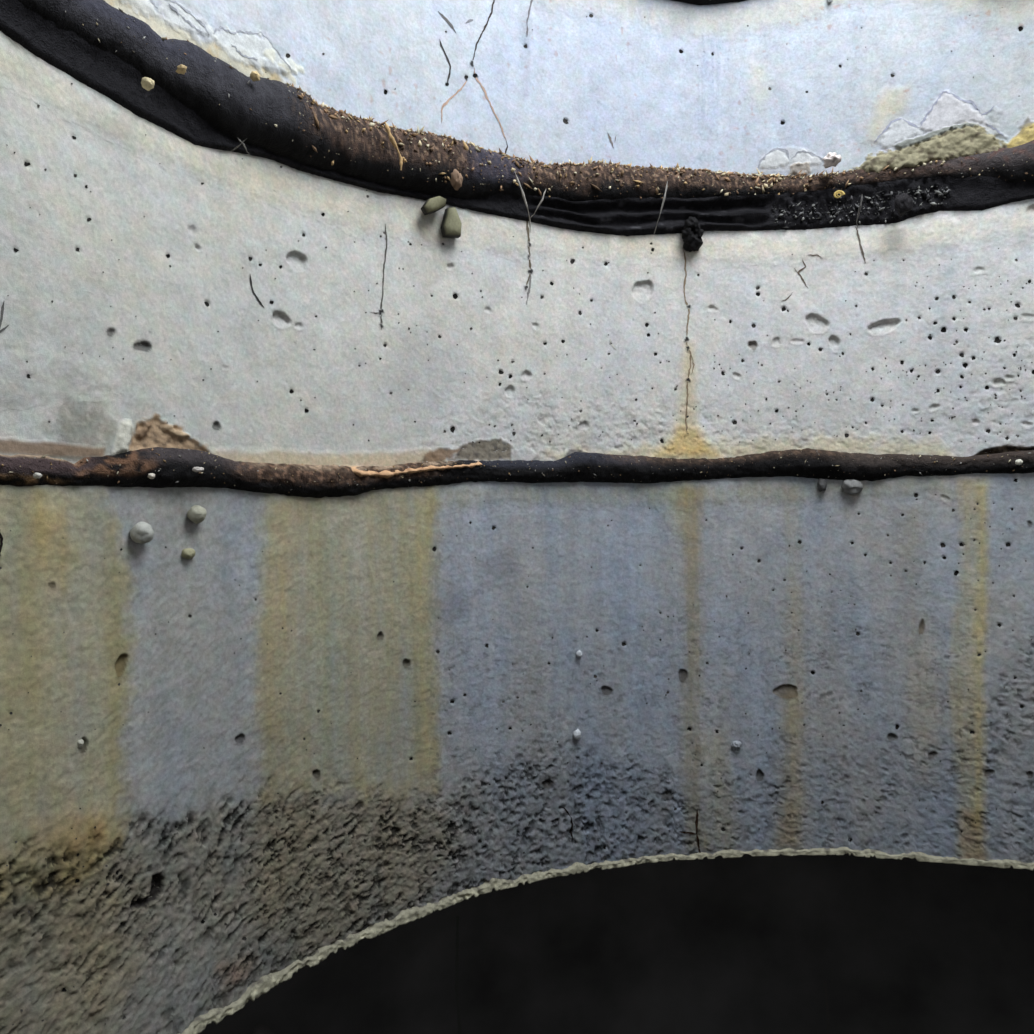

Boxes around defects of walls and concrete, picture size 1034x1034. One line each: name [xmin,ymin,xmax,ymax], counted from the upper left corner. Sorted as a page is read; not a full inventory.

peeling [105,0,340,111]
crack [441,0,508,153]
crack [523,0,533,49]
peeling [755,144,824,176]
peeling [873,87,1011,150]
crack [523,221,534,302]
crack [683,249,695,431]
water stain [0,485,160,1034]
water stain [236,473,997,971]